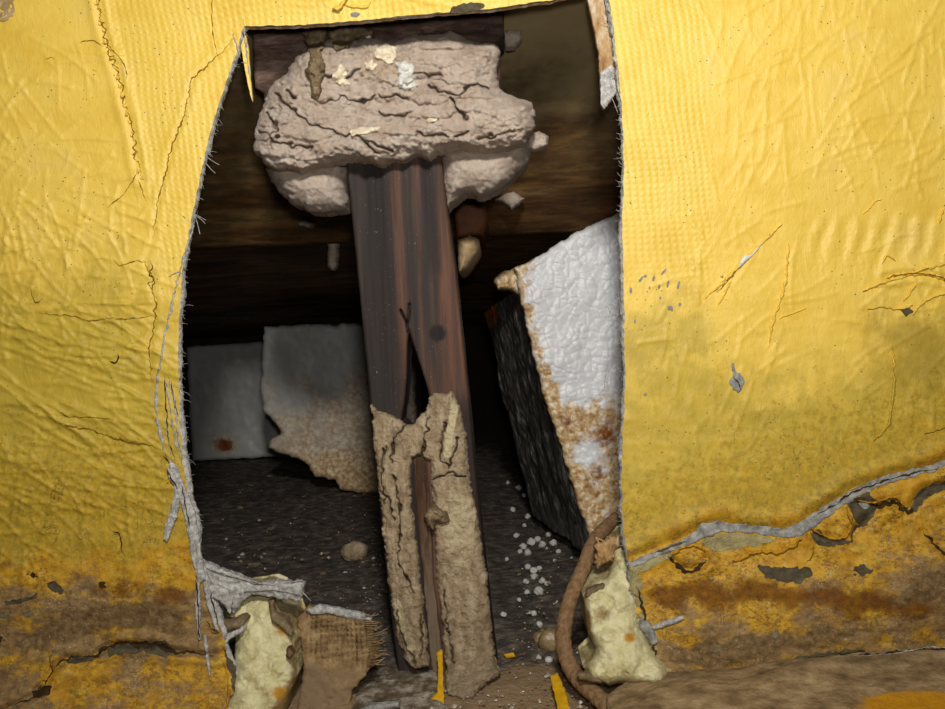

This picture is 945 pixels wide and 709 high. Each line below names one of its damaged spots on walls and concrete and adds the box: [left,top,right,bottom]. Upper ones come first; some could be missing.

peeling [0,0,15,22]
peeling [448,2,485,14]
crack [153,42,231,233]
spalling [493,268,519,296]
crack [890,272,945,280]
crack [31,260,158,379]
crack [625,460,945,621]
peeling [584,583,605,598]
peeling [268,597,296,659]
crack [5,640,225,708]
peeling [431,649,445,704]